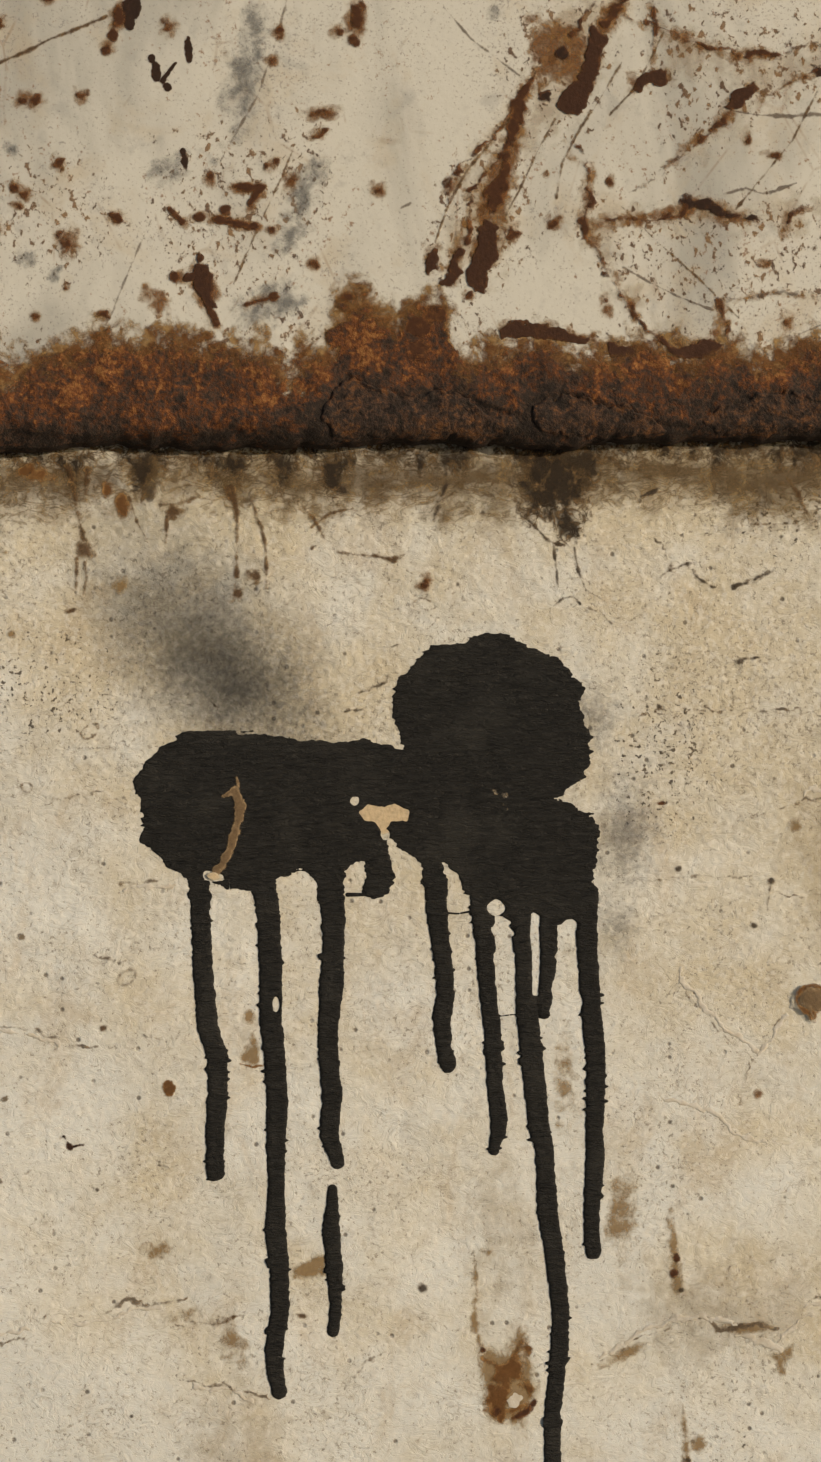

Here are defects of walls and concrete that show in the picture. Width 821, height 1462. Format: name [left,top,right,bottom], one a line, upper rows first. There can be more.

corrosion [265,25,284,66]
corrosion [330,0,367,47]
corrosion [628,6,781,93]
corrosion [308,106,338,139]
corrosion [10,182,32,210]
corrosion [108,211,124,224]
corrosion [167,158,299,234]
corrosion [592,193,760,229]
corrosion [0,253,821,598]
leakage [0,446,584,605]
leakage [578,443,821,554]
corrosion [471,1270,537,1425]